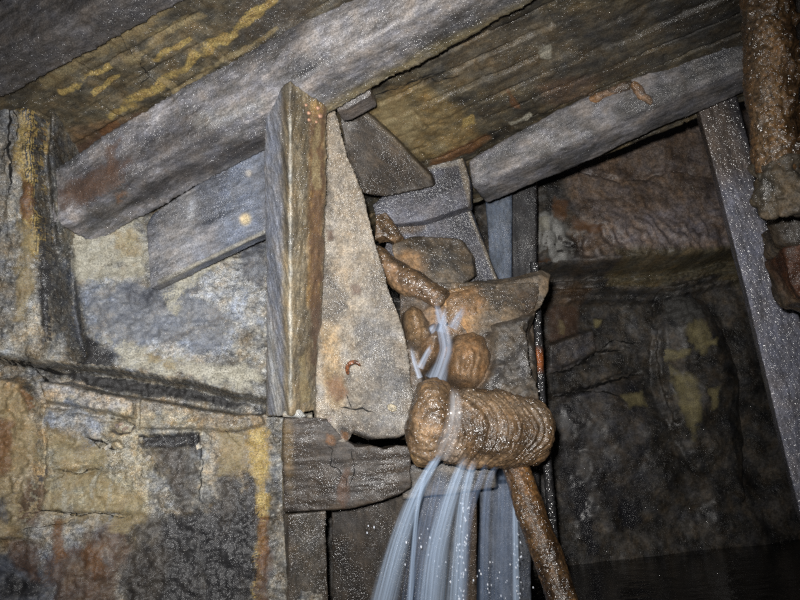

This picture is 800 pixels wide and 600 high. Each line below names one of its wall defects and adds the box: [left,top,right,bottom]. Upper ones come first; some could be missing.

crack [2,110,19,195]
crack [23,509,129,530]
damp [120,460,269,600]
rust [220,427,271,600]